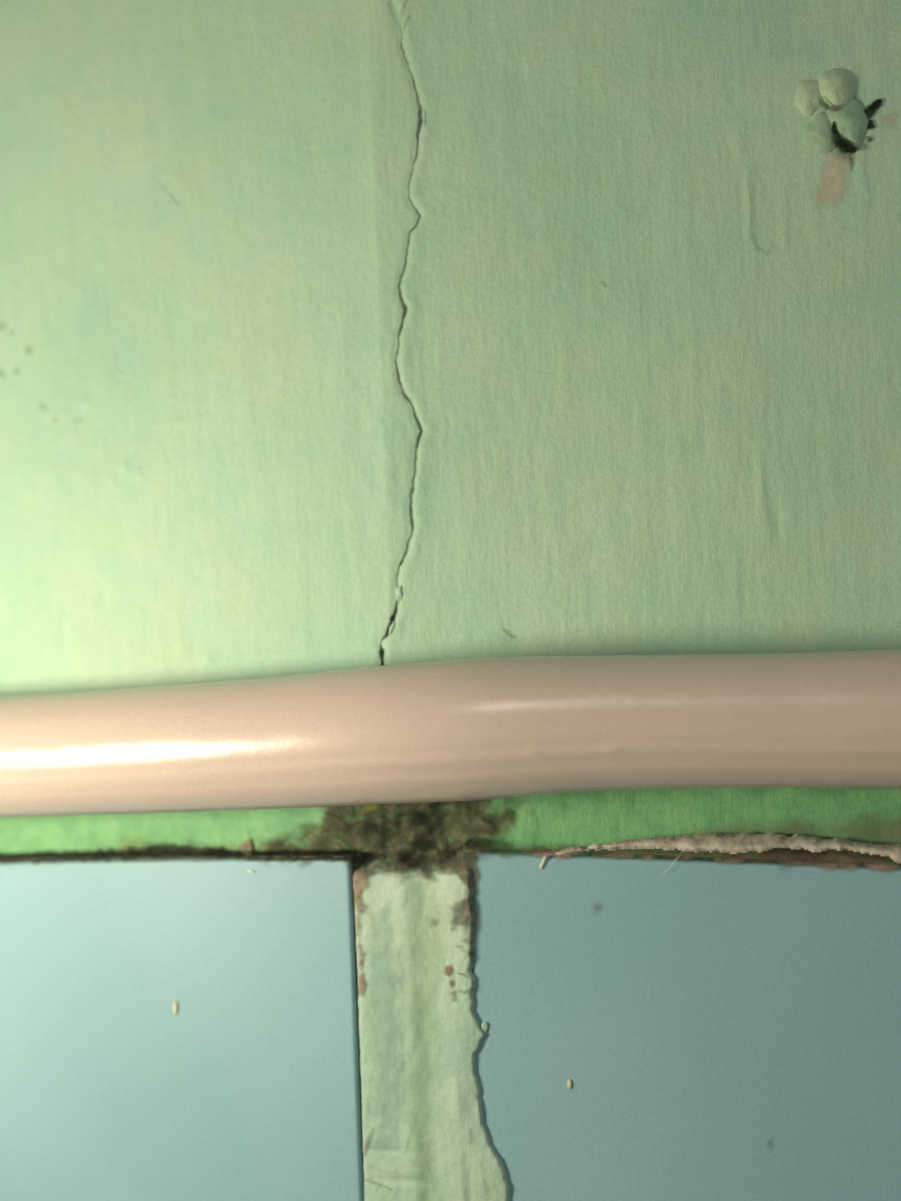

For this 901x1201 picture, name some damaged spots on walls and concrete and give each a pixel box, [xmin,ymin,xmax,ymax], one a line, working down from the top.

crack [379,80,426,666]
damp [252,799,514,961]
peeling [539,831,901,870]